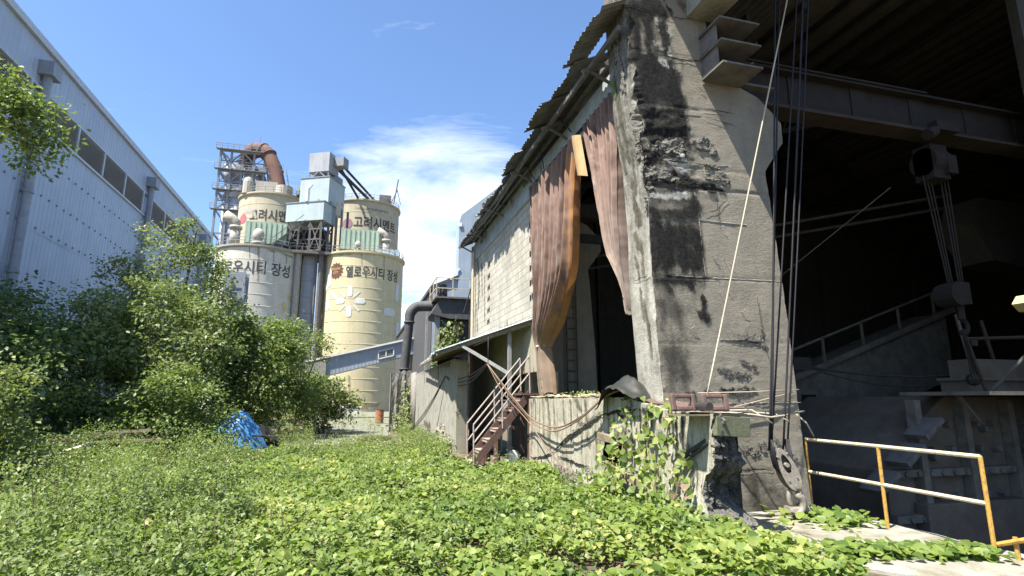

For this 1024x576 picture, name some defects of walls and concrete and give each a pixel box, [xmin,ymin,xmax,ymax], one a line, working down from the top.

water stain [609,0,726,357]
spalling [628,106,730,212]